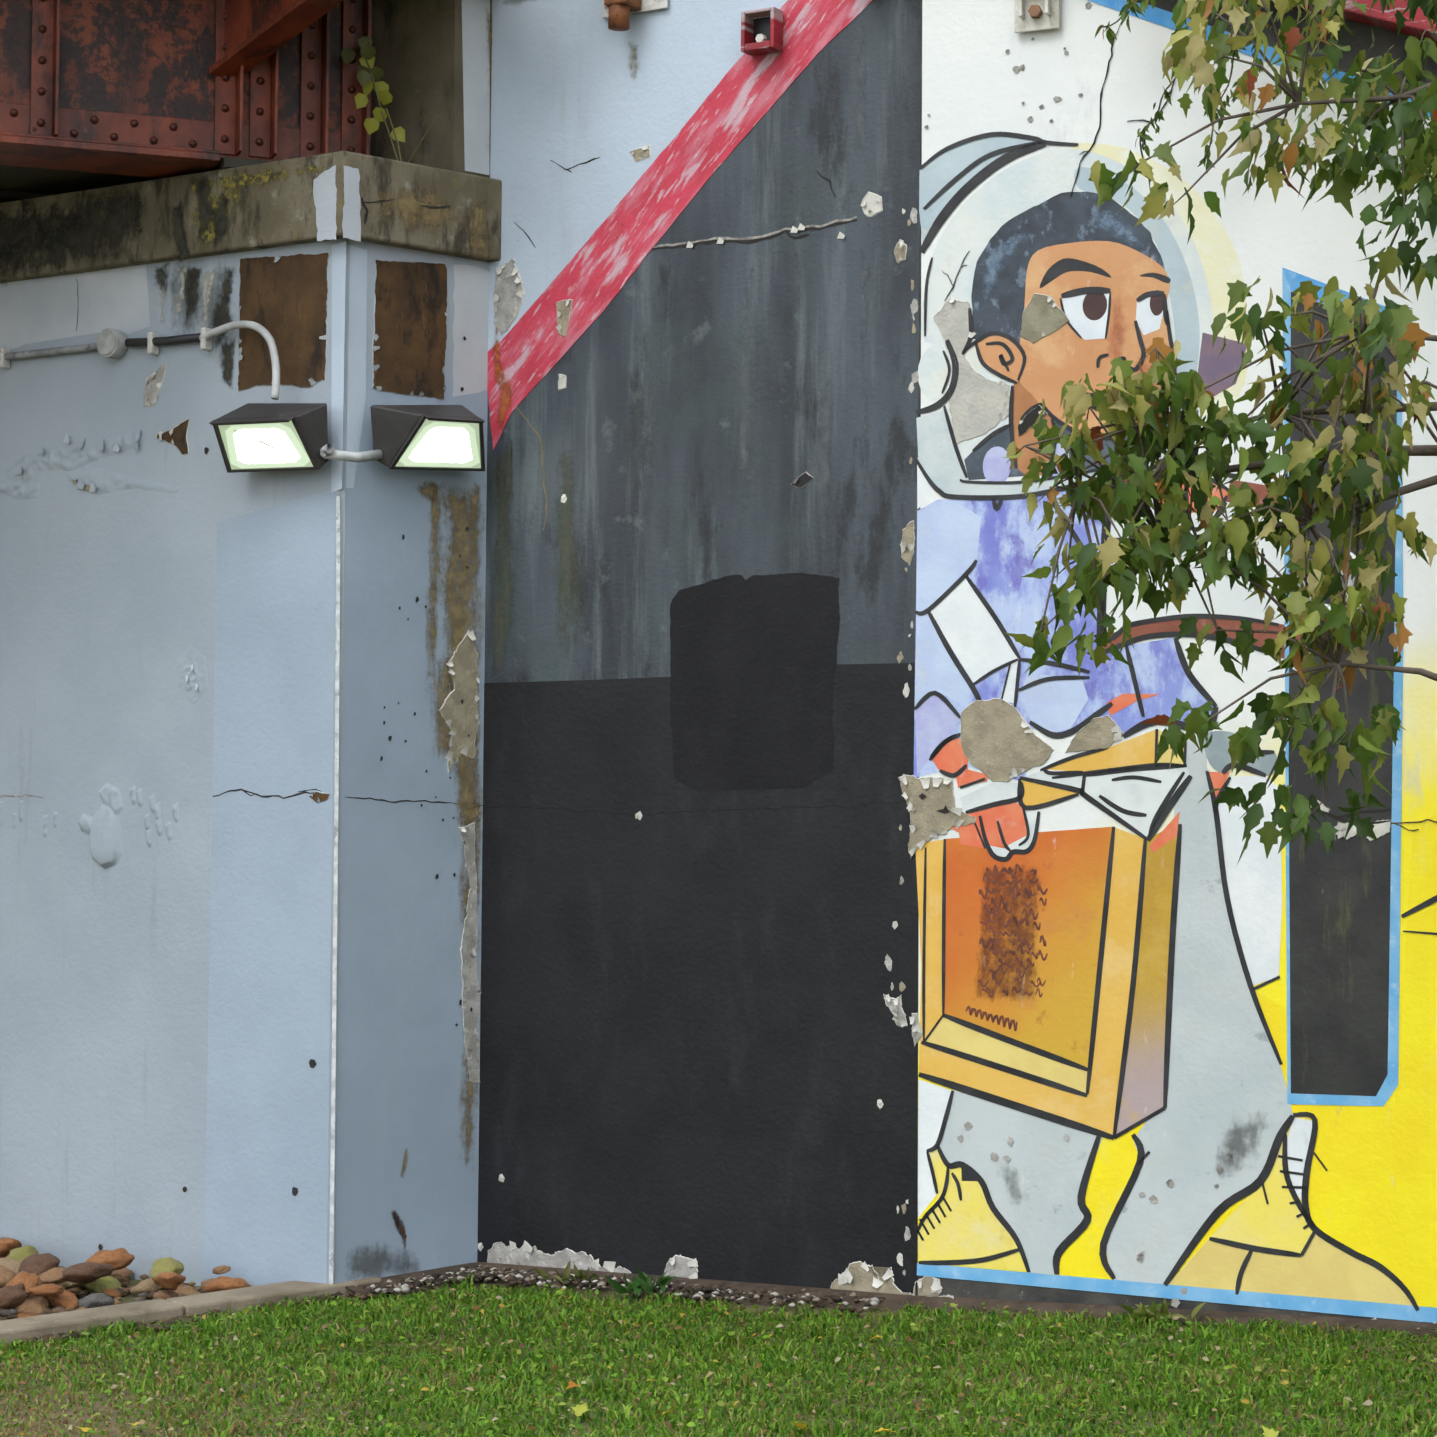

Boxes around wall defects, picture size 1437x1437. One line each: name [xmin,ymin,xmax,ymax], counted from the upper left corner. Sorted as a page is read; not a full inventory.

damp [0,192,143,275]
damp [381,189,450,231]
crack [651,171,857,250]
damp [156,166,323,386]
peeling [237,252,329,391]
peeling [372,259,464,400]
peeling [910,279,1048,444]
crack [0,794,58,838]
spalling [898,774,977,858]
spalling [1310,800,1392,841]
peeling [478,1240,631,1274]
peeling [664,1254,698,1279]